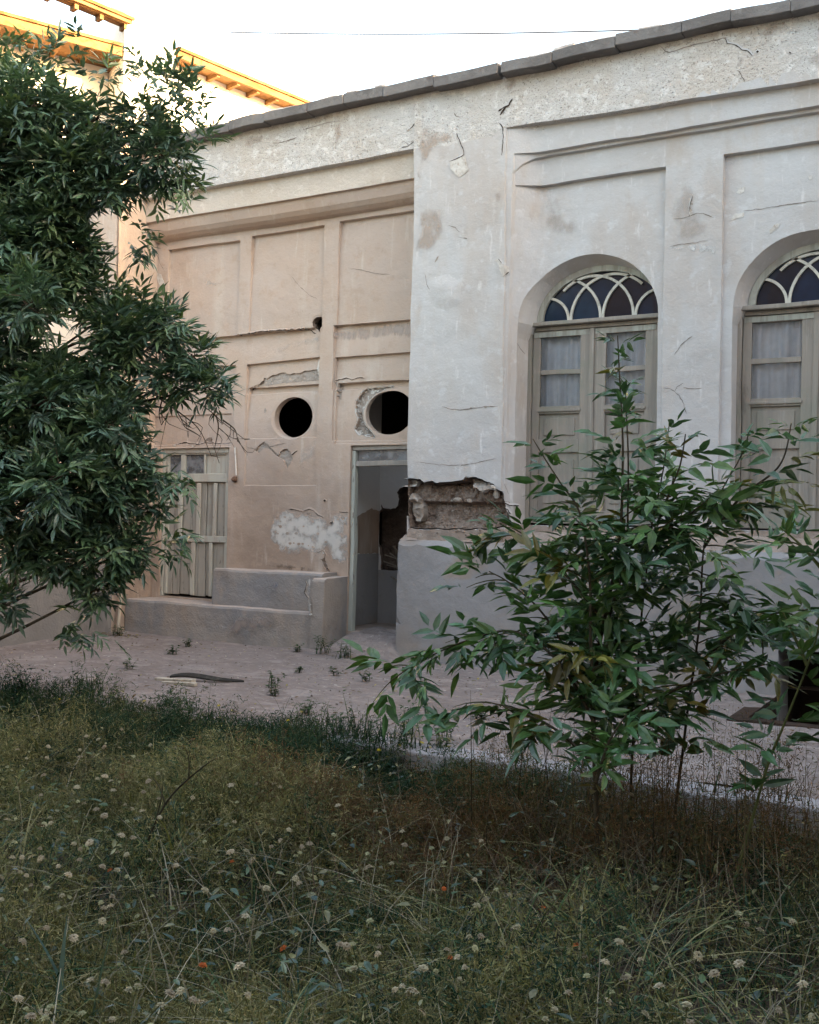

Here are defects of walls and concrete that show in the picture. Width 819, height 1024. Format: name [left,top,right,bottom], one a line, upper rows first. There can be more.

crack [663,37,754,81]
crack [498,97,514,155]
crack [676,194,711,219]
spalling [251,359,320,390]
spalling [355,385,394,438]
crack [445,404,497,412]
spalling [246,443,297,468]
spalling [380,477,510,536]
peeling [271,507,348,571]